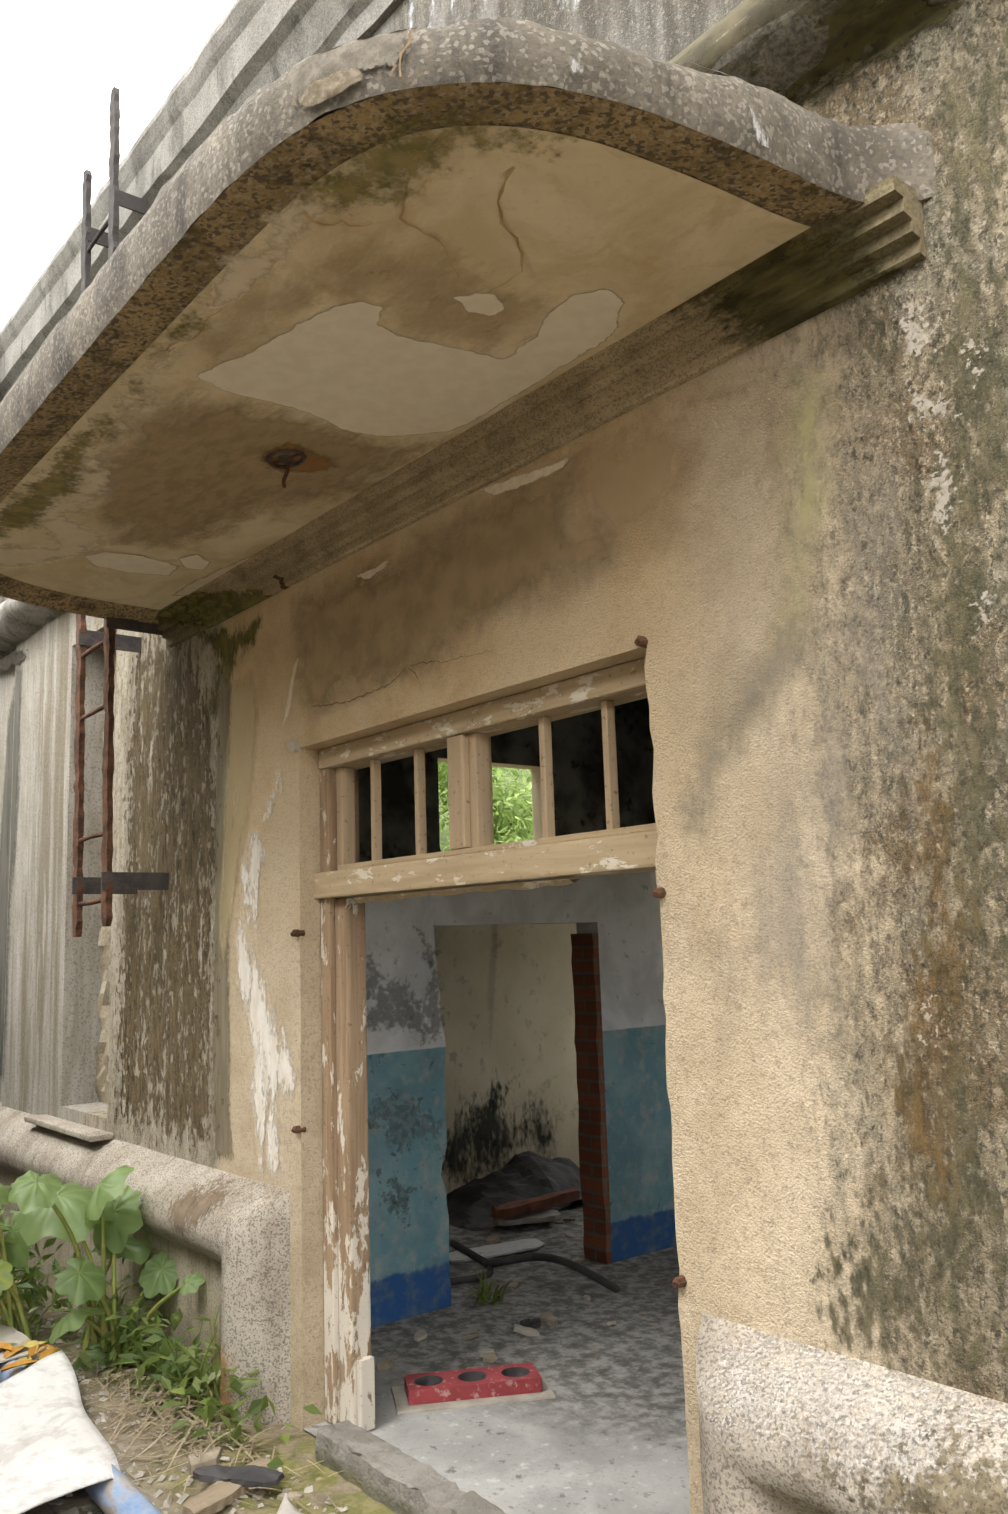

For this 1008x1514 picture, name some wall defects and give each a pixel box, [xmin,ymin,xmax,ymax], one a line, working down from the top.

leakage [490,167,524,292]
leakage [668,220,900,345]
leakage [0,191,423,567]
peeling [197,289,624,436]
corrosion [263,443,337,472]
leakage [298,481,610,705]
crack [311,651,491,707]
leakage [817,28,1008,1394]
leakage [114,633,295,1237]
leakage [441,1084,554,1184]